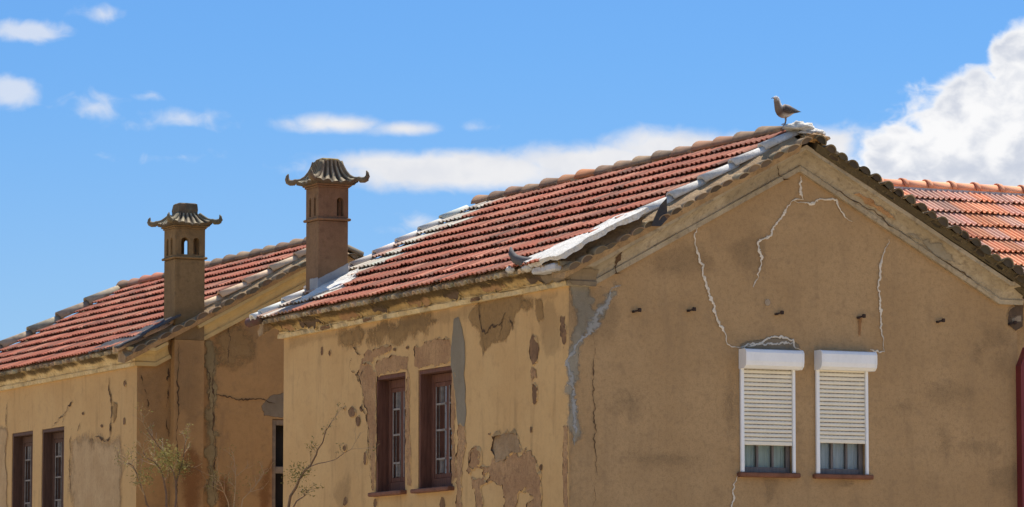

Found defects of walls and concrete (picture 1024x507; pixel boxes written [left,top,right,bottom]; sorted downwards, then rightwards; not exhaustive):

crack [54,385,112,498]
crack [207,329,272,504]
peeling [281,293,543,507]
peeling [442,279,543,353]
crack [694,228,800,350]
crack [753,166,993,353]